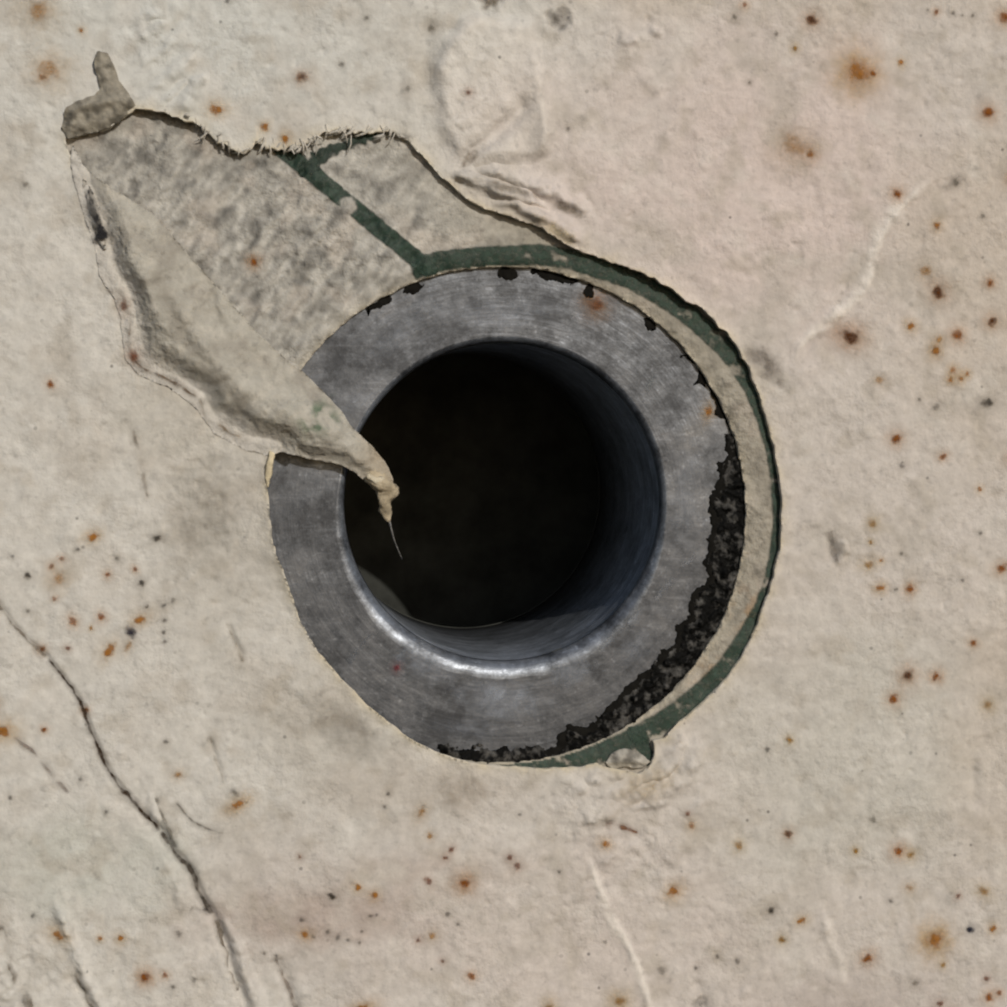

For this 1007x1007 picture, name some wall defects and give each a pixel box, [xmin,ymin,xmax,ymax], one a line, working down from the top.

peeling [61,51,780,870]
corrosion [844,330,858,345]
crack [0,605,297,1007]
corrosion [924,931,943,949]